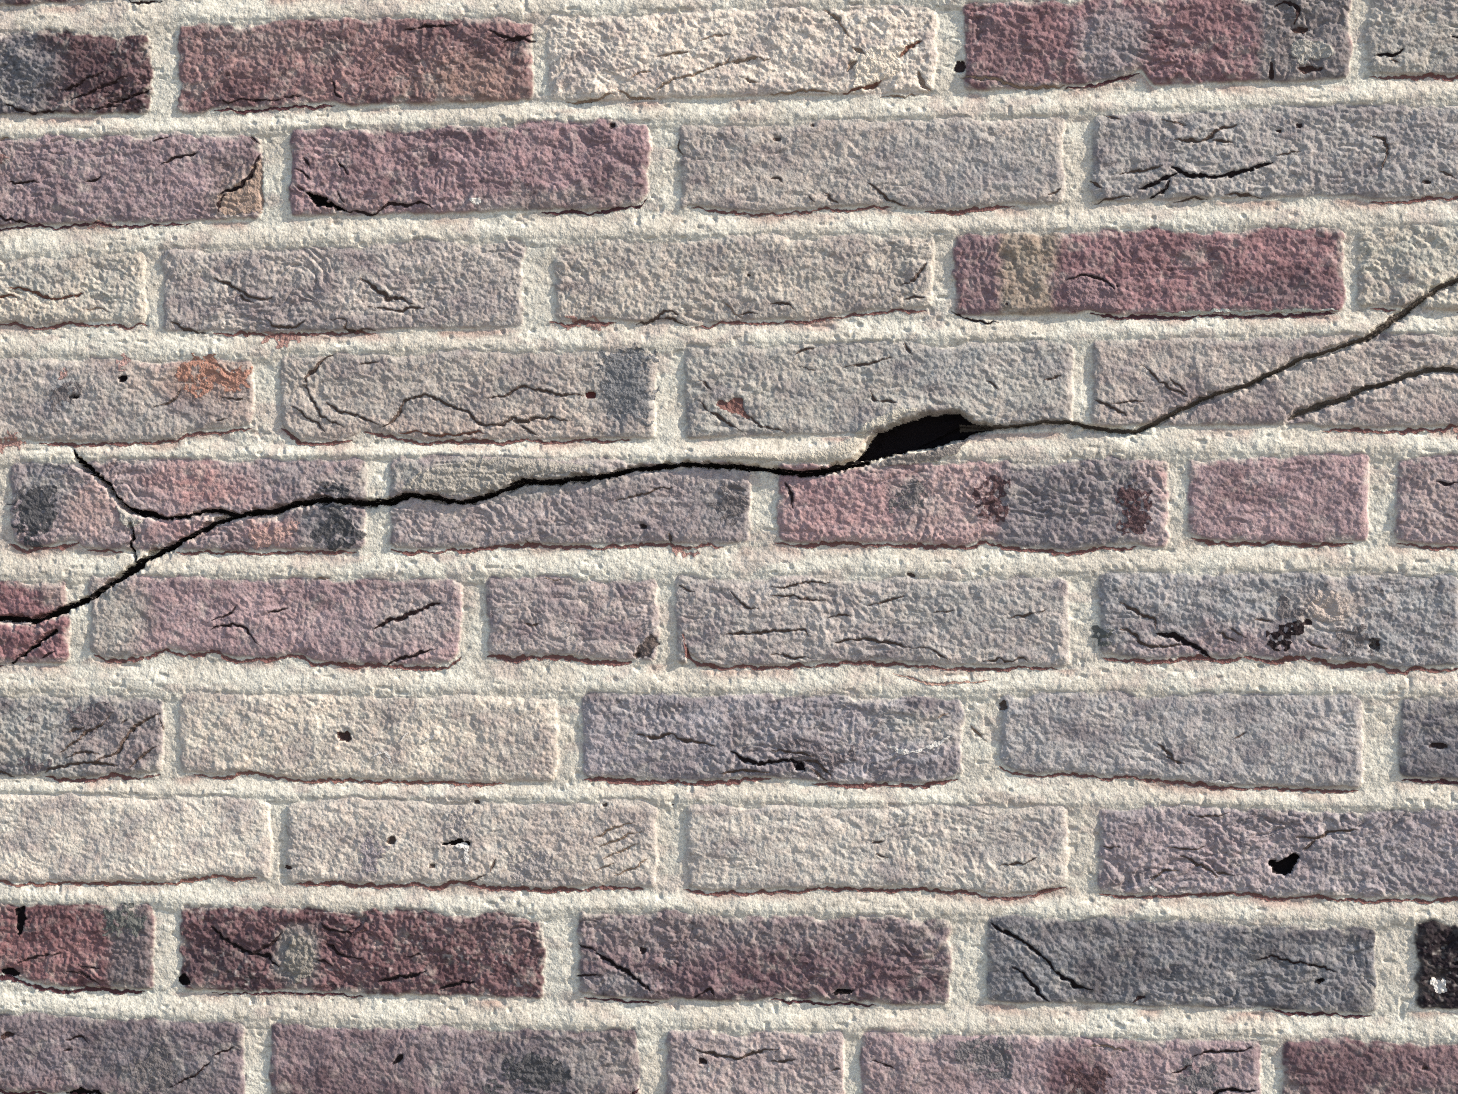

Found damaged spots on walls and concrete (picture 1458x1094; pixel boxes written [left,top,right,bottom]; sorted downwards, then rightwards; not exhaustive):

crack [0,71,343,231]
crack [549,262,998,403]
crack [960,274,1458,435]
crack [0,277,870,672]
crack [1191,537,1353,549]
crack [0,714,504,788]
crack [584,733,958,789]
crack [682,540,1458,1002]
crack [0,874,257,887]
crack [296,823,647,894]
crack [0,953,145,995]
crack [211,923,474,998]